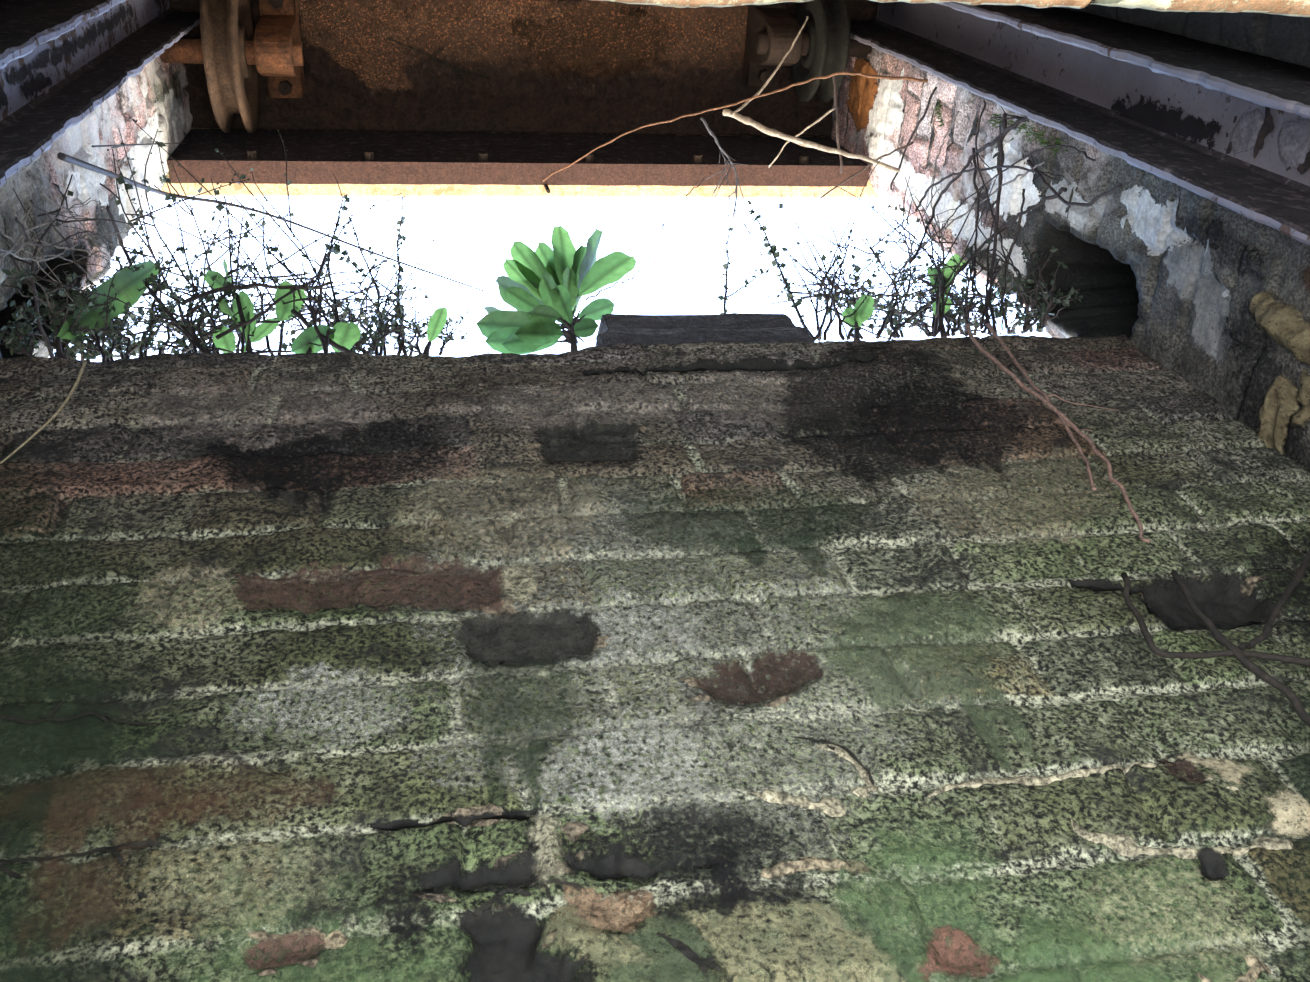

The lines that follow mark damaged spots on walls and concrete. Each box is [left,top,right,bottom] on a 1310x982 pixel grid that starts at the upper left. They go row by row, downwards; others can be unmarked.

peeling [878,0,1092,8]
peeling [1157,0,1310,15]
corrosion [846,58,879,132]